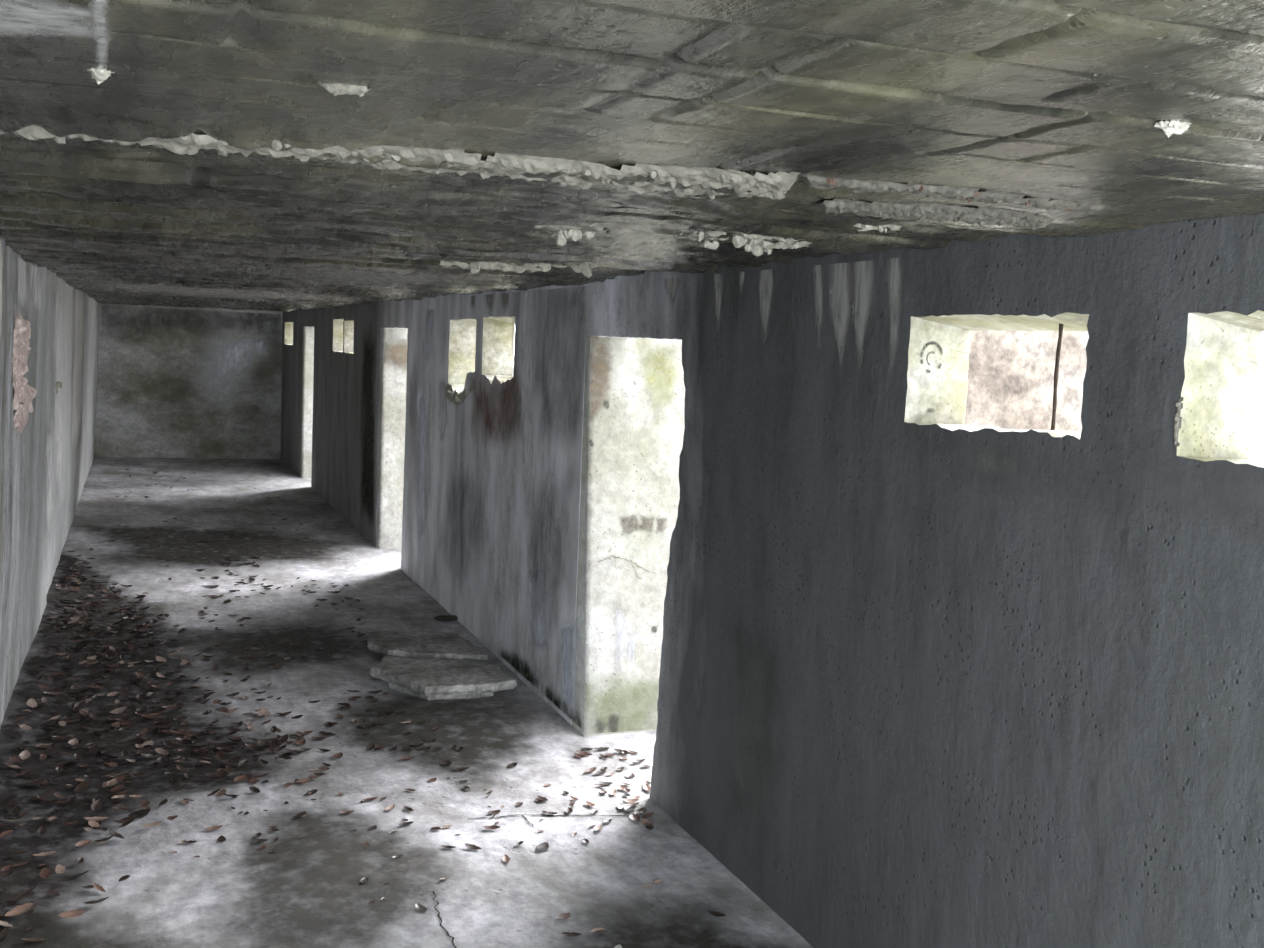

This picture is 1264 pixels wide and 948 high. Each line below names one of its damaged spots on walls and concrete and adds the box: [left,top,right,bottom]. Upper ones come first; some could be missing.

spalling [12,309,37,435]
spalling [445,378,475,405]
leakage [598,715,618,732]
crack [432,894,457,948]